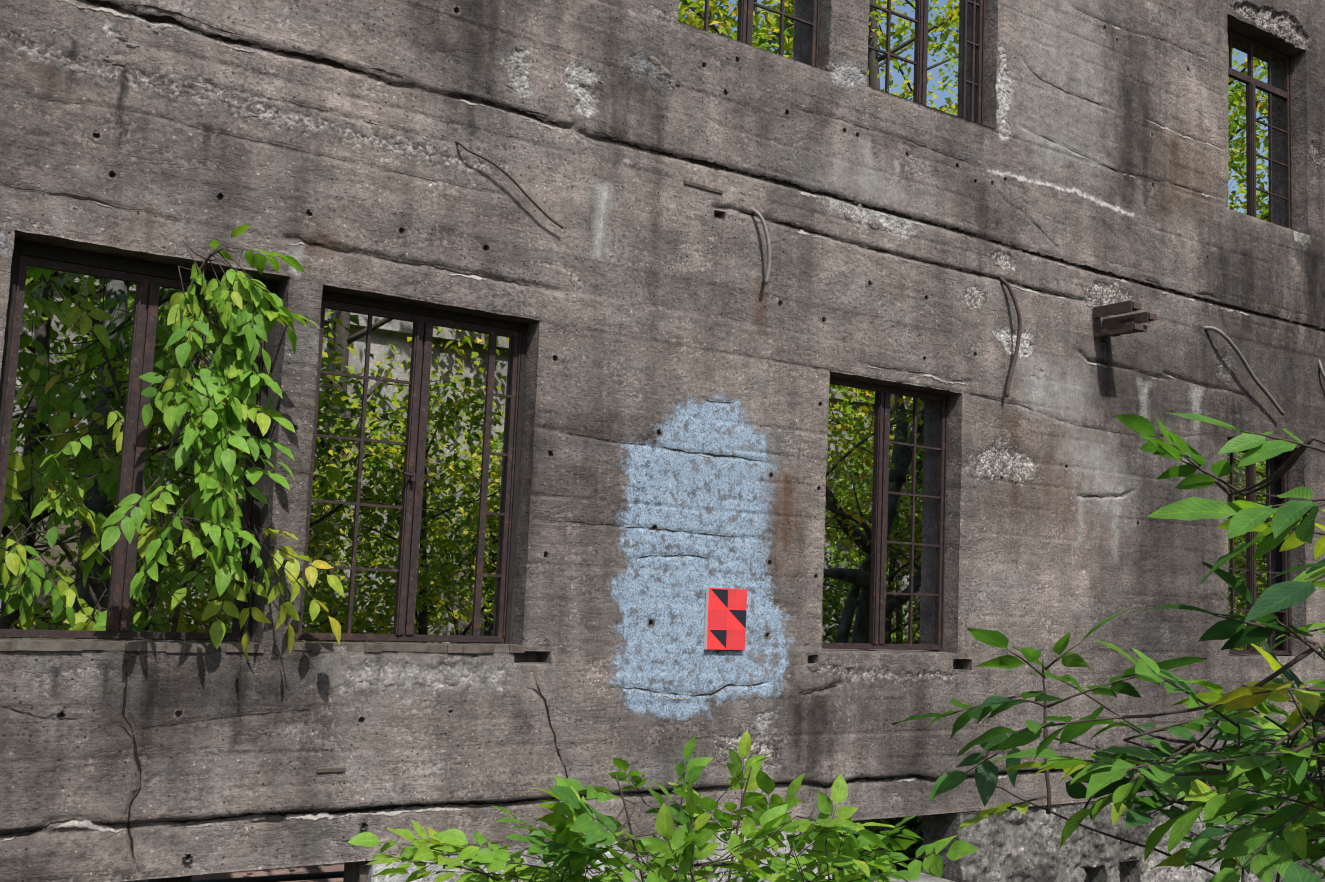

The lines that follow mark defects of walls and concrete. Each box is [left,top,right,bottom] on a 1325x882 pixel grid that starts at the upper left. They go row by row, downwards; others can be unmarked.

crack [0,664,936,872]
crack [969,767,1085,779]